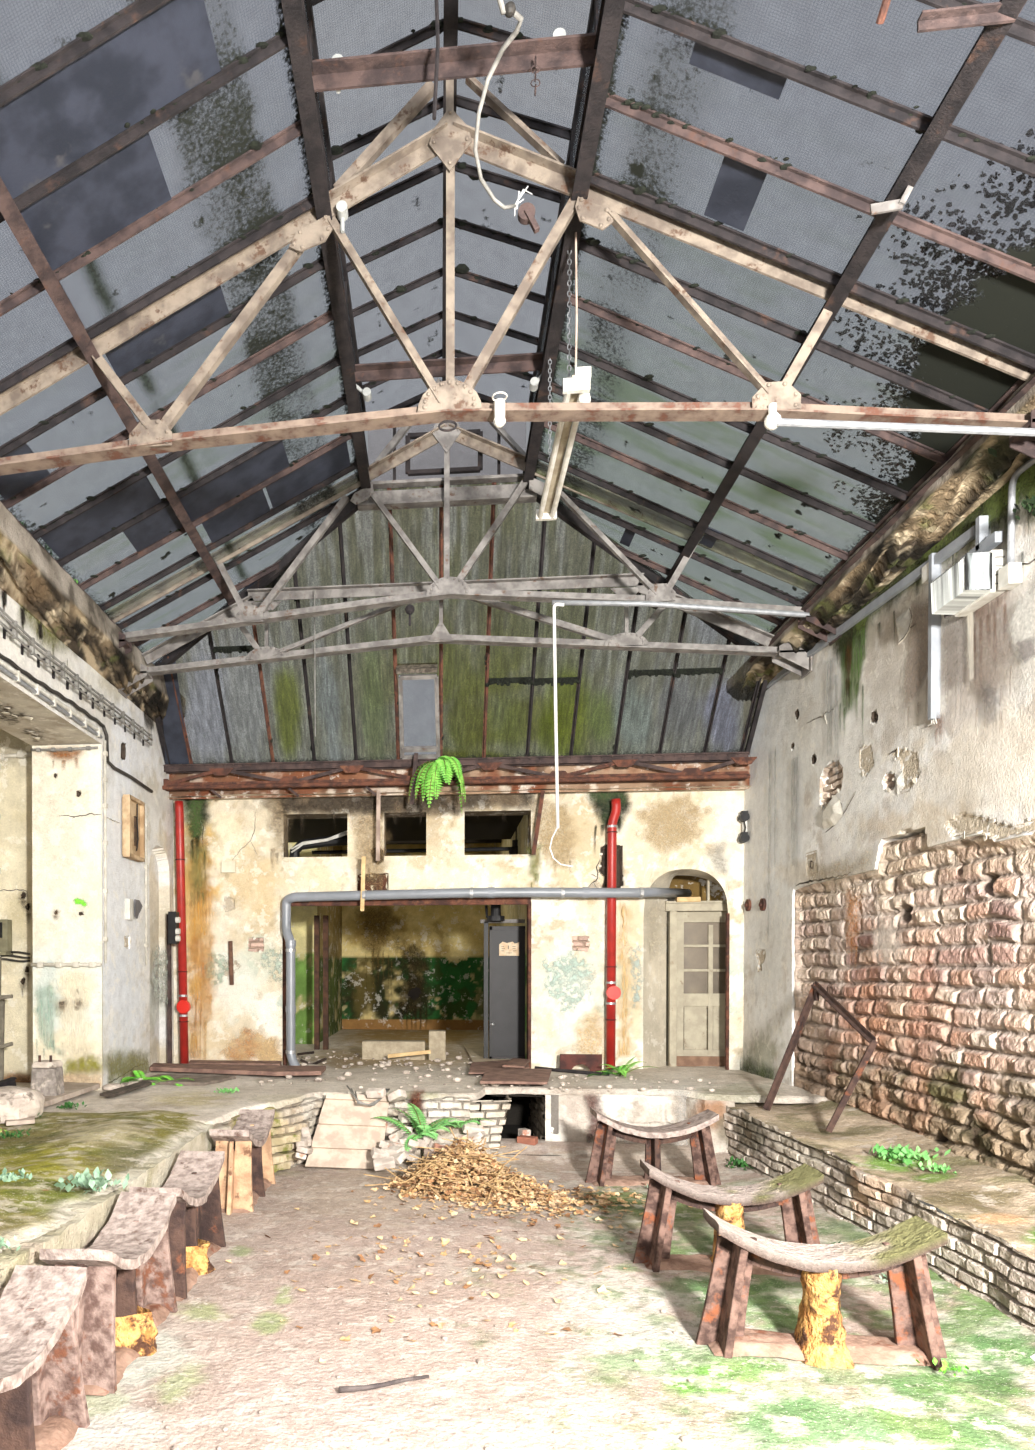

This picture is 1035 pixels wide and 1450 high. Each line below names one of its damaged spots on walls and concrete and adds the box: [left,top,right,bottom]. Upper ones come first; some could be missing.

water stain [827,650,863,732]
water stain [878,588,1035,716]
flaking render [819,744,920,810]
water stain [191,837,206,1048]
flaking render [794,812,1035,1185]